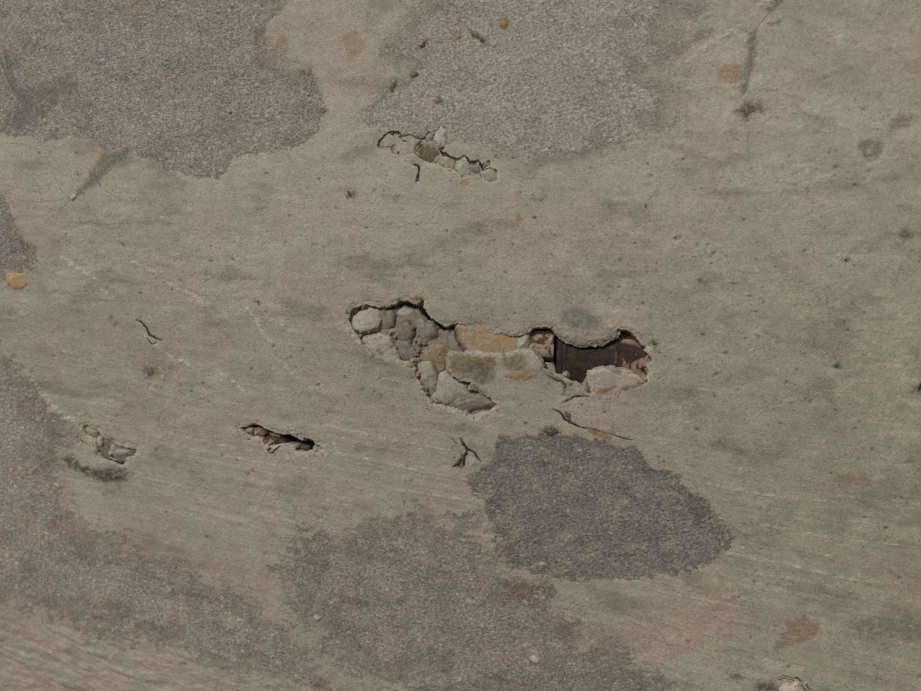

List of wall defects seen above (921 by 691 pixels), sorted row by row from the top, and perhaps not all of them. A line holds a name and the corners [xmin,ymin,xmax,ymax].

peeling [361,0,709,182]
spalling [345,300,570,423]
crack [453,440,481,467]
crack [552,377,630,440]
peeling [0,357,734,691]